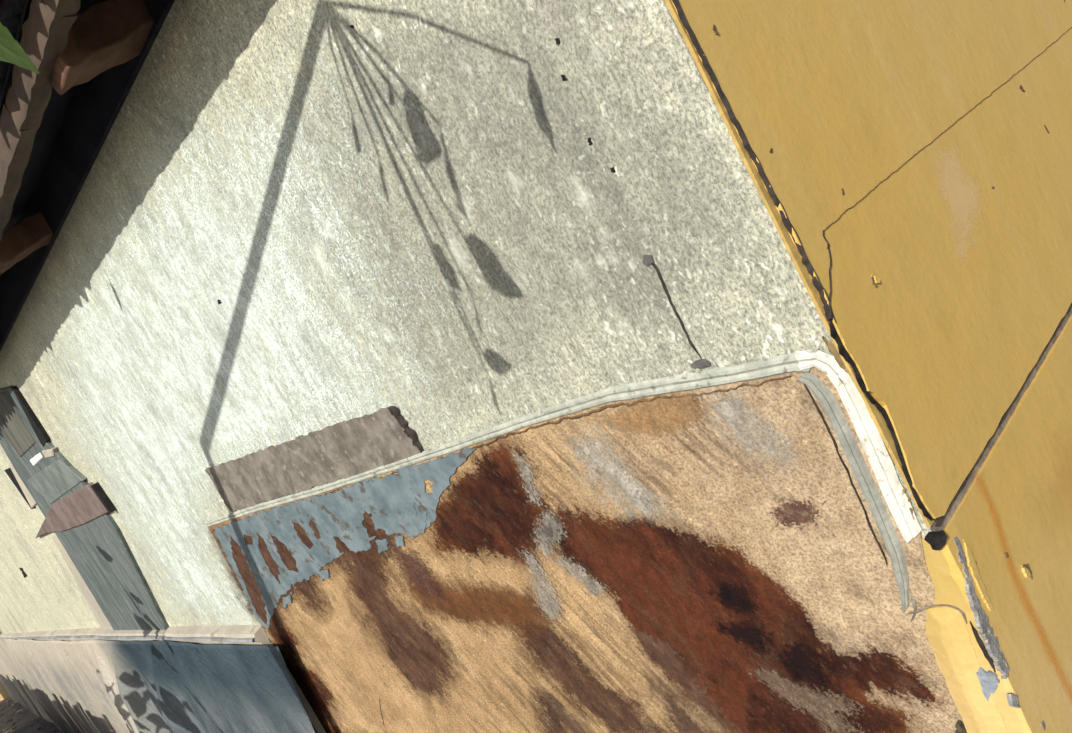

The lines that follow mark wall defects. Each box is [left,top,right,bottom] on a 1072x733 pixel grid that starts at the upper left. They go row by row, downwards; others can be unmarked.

crack [672,0,1072,323]
water stain [572,441,663,516]
peeling [208,448,476,643]
water stain [343,547,457,700]
water stain [510,617,713,733]
water stain [750,665,864,733]
spalling [955,720,967,733]
spalling [953,537,1020,708]
peeling [1021,564,1033,580]